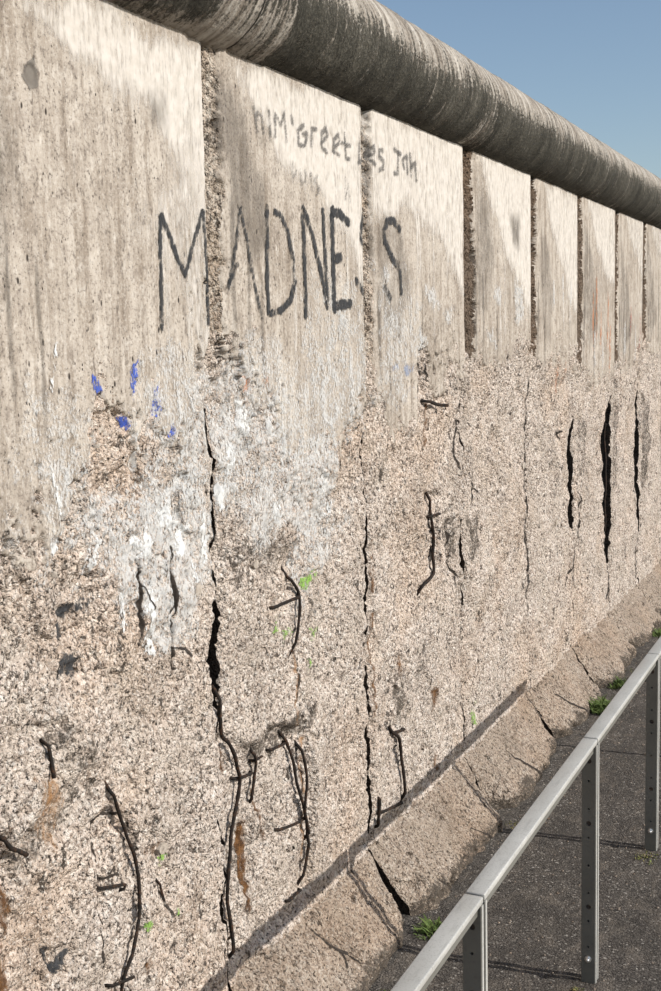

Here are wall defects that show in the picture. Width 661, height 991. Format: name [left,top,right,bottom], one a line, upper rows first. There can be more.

spalling [457,151,661,754]
spalling [0,47,465,991]
crack [136,545,193,670]
rust [0,947,8,991]
rust [0,890,11,935]
rust [234,821,251,912]